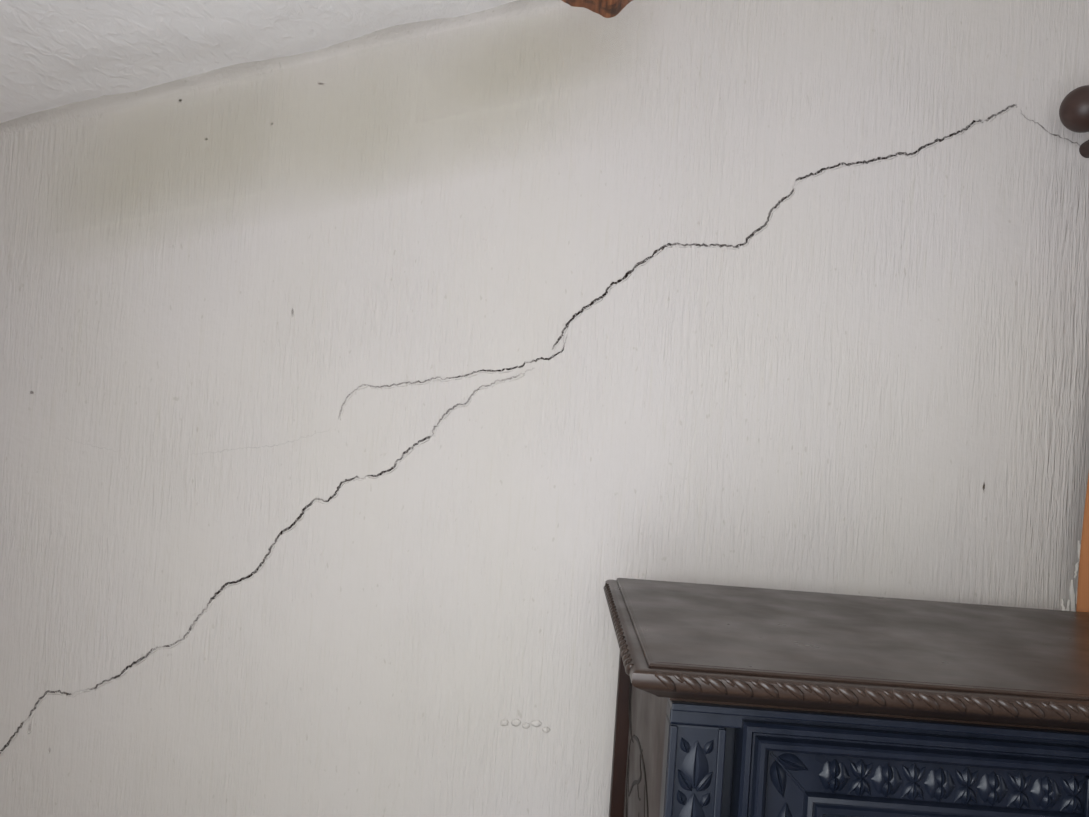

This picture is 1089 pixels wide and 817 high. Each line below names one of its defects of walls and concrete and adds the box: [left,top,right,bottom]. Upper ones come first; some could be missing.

crack [0,105,1017,757]